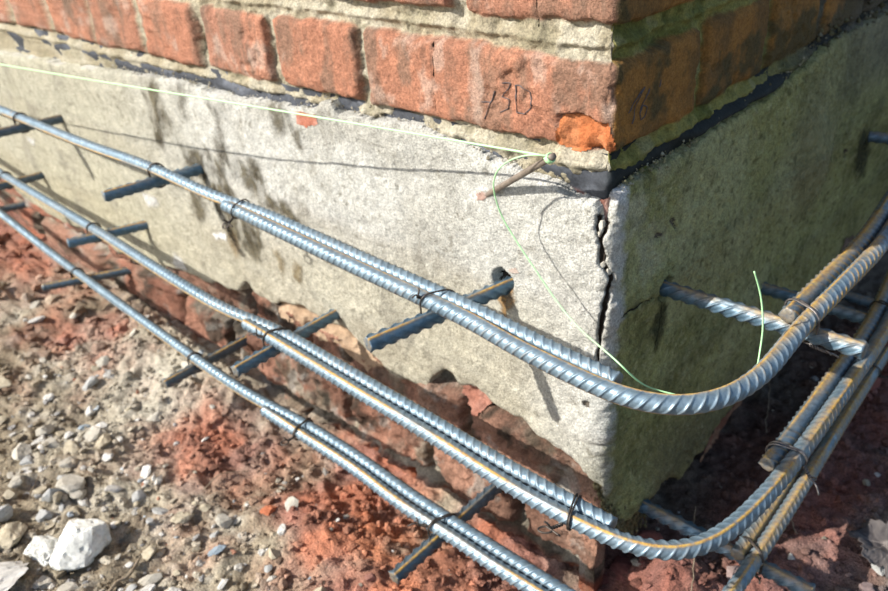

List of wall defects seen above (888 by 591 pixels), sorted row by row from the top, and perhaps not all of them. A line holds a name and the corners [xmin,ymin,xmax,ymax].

damp [142,83,170,146]
damp [269,103,283,131]
damp [190,192,204,220]
damp [180,145,234,196]
damp [241,160,297,222]
damp [856,131,870,175]
damp [213,203,262,260]
crack [596,215,653,361]
spalling [279,302,319,329]
spalling [316,324,384,372]
damp [652,304,667,350]
spalling [462,385,492,416]